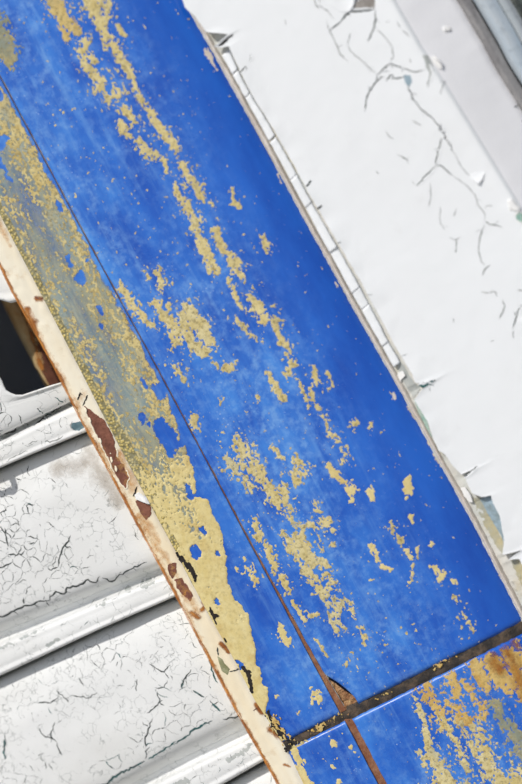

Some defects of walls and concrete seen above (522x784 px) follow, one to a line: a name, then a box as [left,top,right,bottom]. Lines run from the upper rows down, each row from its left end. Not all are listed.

peeling [0,11,24,72]
crack [0,612,260,784]
rust [0,264,278,784]
peeling [0,87,370,784]
peeling [36,0,385,505]
flaking render [190,13,522,621]
crack [314,0,522,337]
peeling [428,565,477,635]
peeling [407,638,522,784]
rust [488,639,522,690]